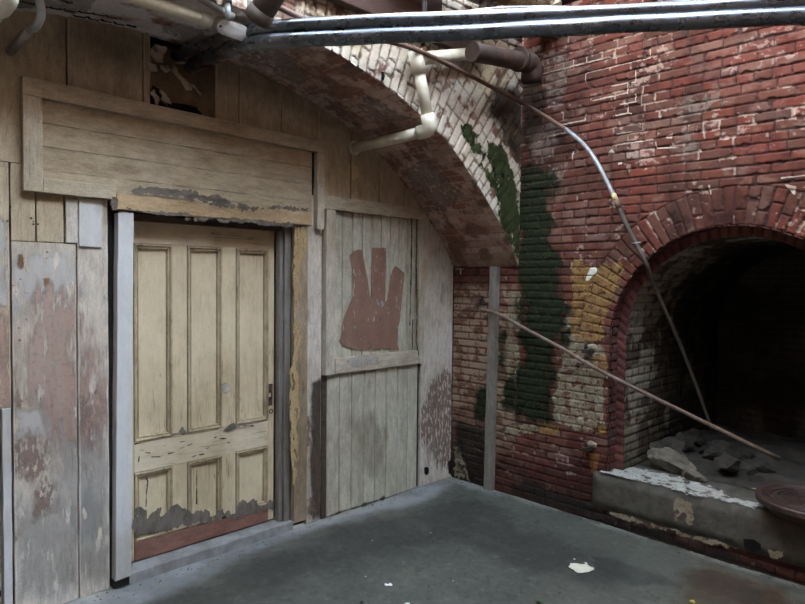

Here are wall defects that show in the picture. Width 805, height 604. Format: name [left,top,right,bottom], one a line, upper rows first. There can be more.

peeling [110,186,308,328]
peeling [0,314,54,518]
peeling [132,498,274,538]